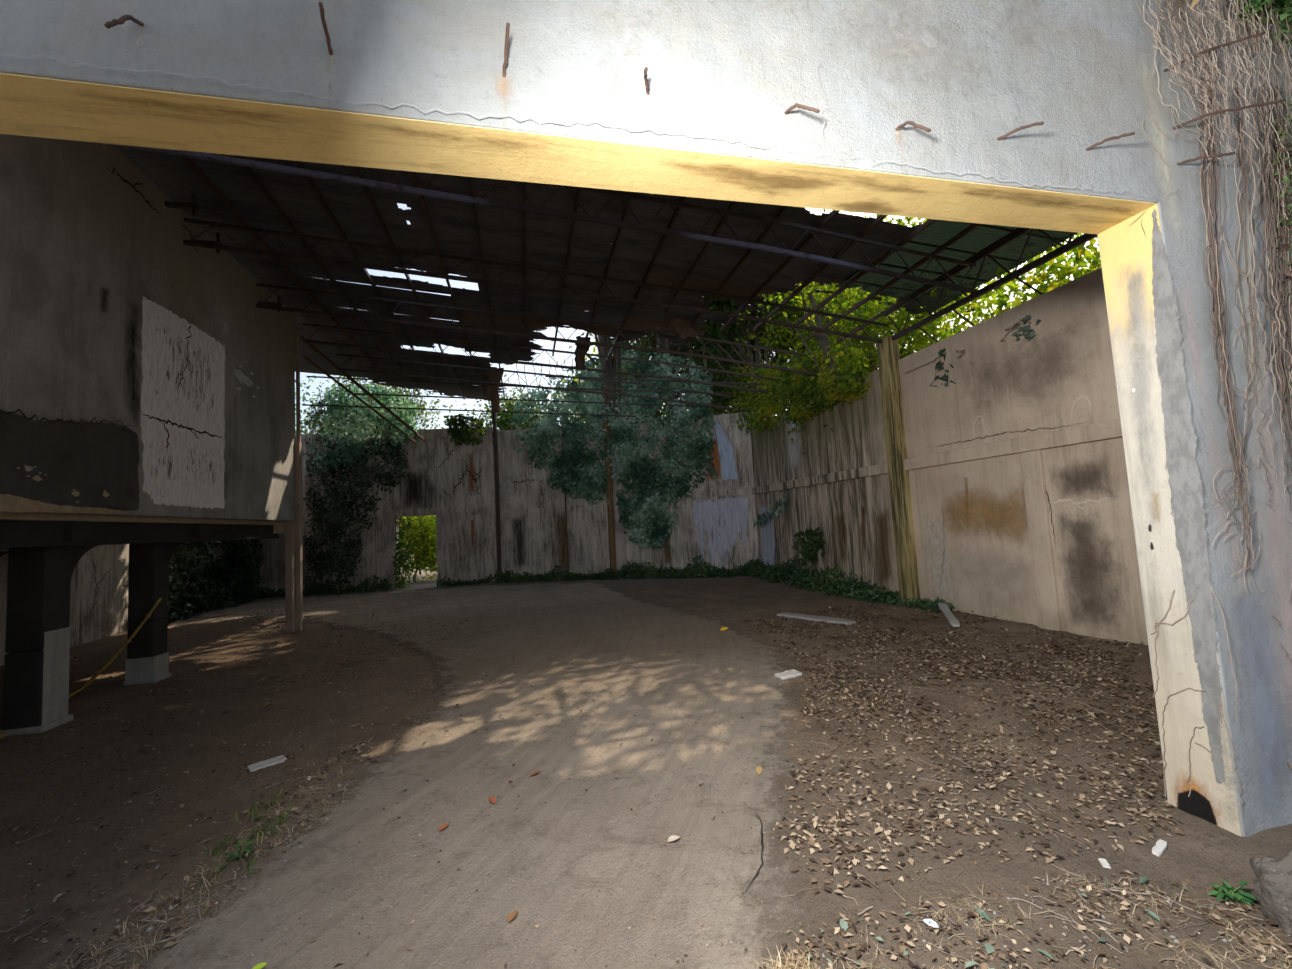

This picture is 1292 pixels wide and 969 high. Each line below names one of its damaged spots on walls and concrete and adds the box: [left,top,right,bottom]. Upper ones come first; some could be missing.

water stain [710,166,828,188]
water stain [842,202,884,212]
crack [0,315,226,449]
peeling [140,296,260,510]
spalling [0,489,133,514]
water stain [952,480,1023,533]
water stain [1064,468,1101,490]
water stain [1068,523,1112,620]